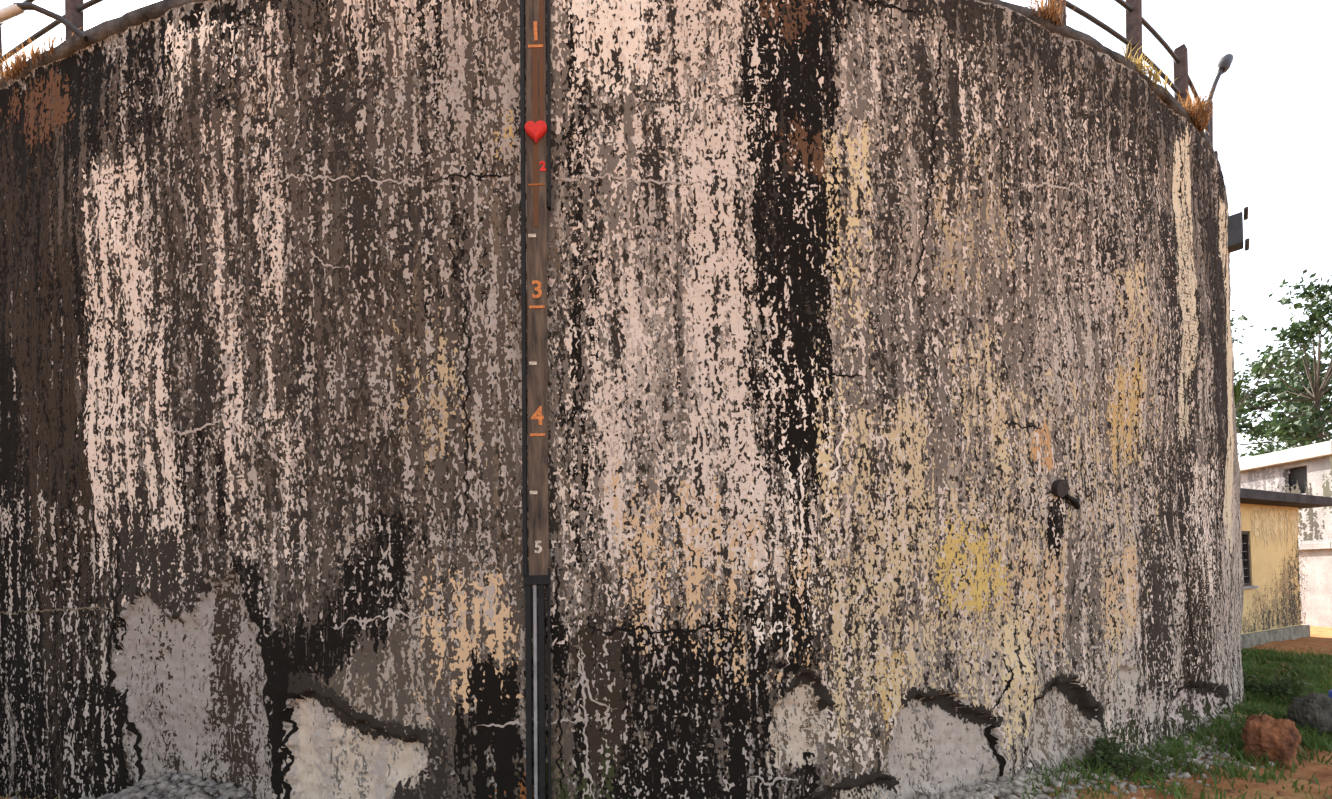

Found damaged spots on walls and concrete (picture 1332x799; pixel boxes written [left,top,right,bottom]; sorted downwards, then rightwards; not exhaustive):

spalling [0,0,538,799]
water stain [0,0,539,799]
water stain [545,0,1245,799]
peeling [537,0,1302,799]
crack [984,664,1015,777]